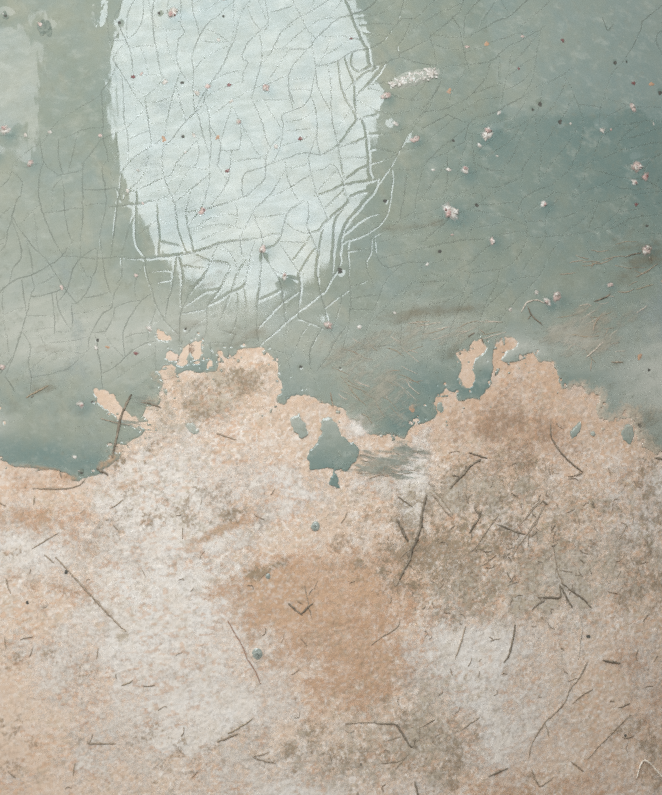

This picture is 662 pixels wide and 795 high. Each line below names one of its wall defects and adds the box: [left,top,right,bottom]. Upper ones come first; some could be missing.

peeling [0,326,662,795]